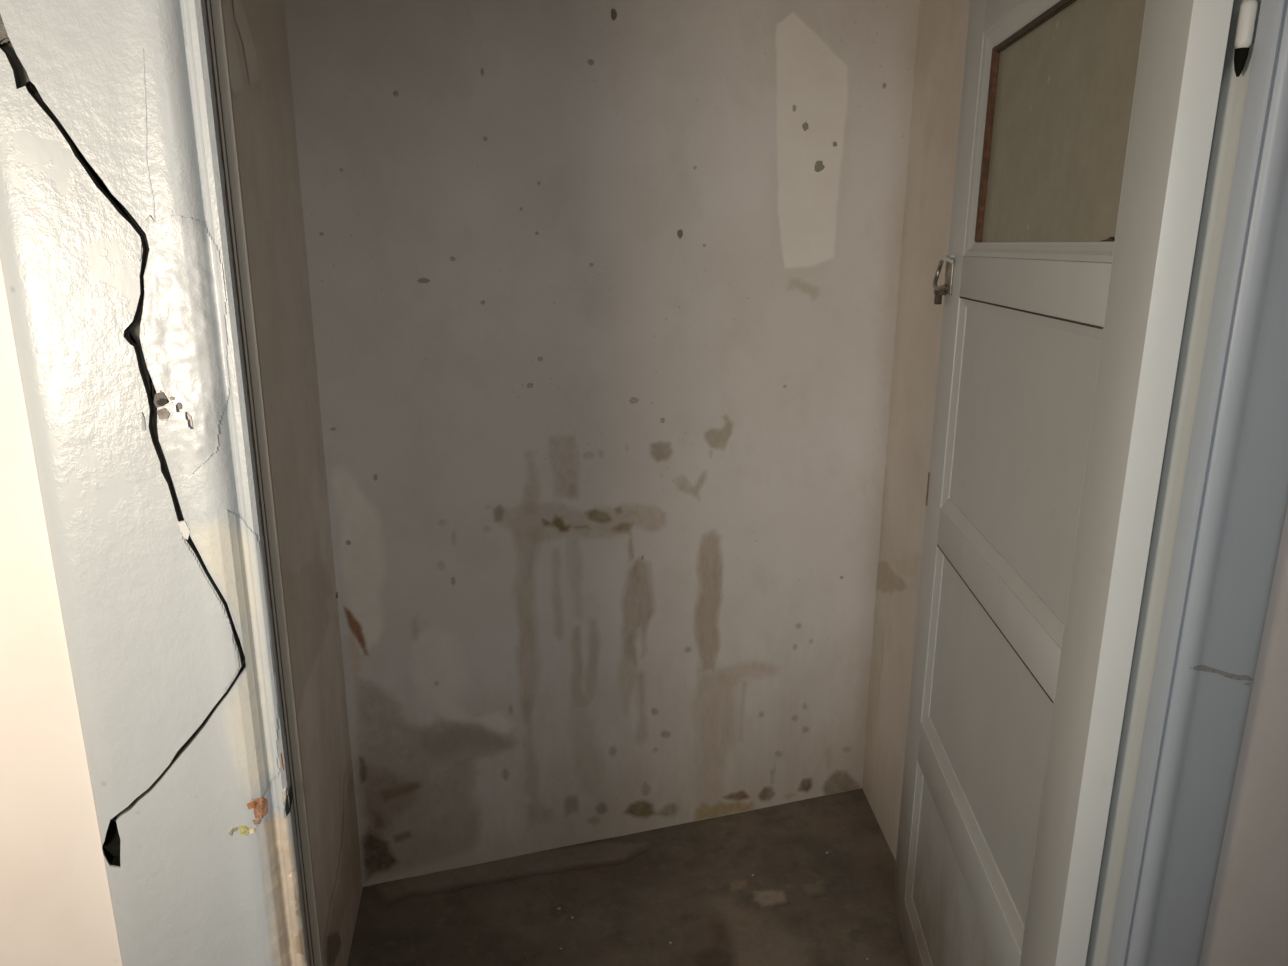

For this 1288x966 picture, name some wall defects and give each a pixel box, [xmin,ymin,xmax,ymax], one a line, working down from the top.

crack [25,51,246,822]
spalling [154,392,193,427]
rust [341,604,373,677]
damp [327,411,816,932]
crack [1190,665,1254,686]